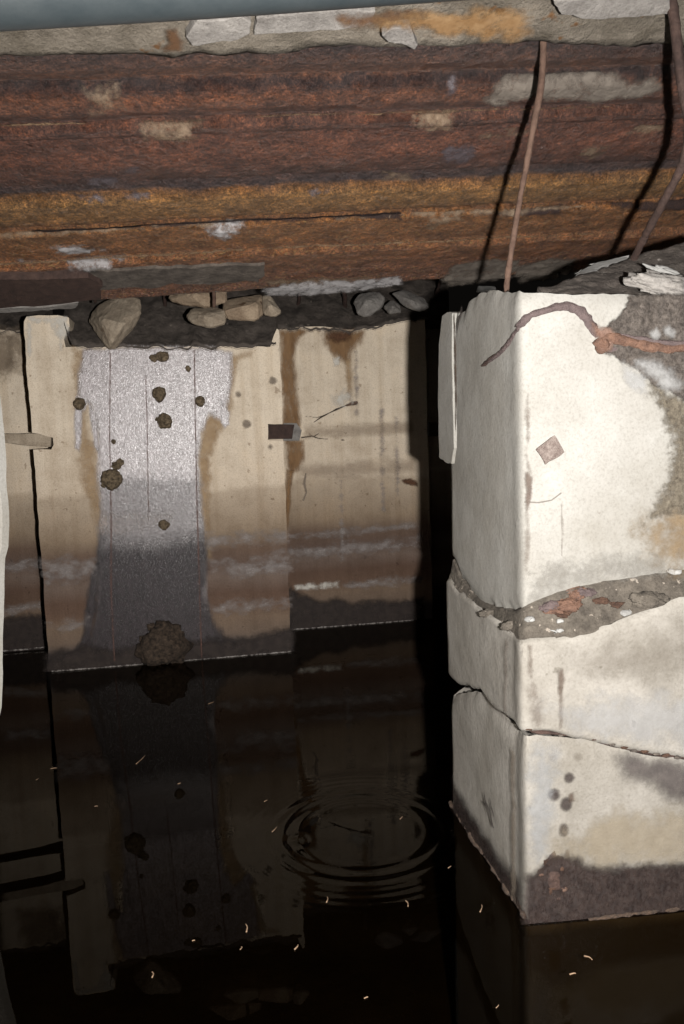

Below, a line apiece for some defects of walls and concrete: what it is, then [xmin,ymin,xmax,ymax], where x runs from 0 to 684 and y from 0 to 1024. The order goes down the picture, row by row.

rust [165,30,183,51]
rust [354,107,570,131]
rust [416,206,580,216]
rust [280,330,305,426]
rust [325,330,363,396]
spalling [592,294,684,518]
water stain [3,347,425,672]
rust [286,441,304,531]
crack [525,729,684,760]
water stain [453,787,684,924]